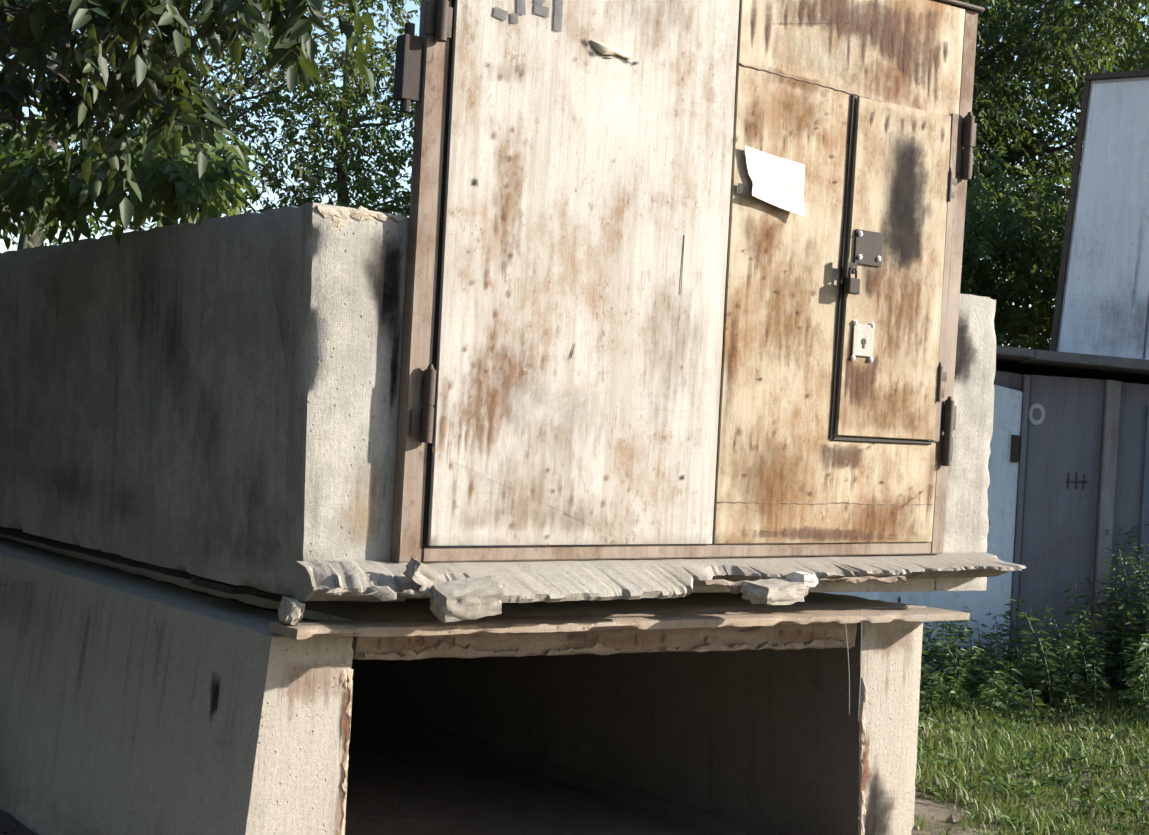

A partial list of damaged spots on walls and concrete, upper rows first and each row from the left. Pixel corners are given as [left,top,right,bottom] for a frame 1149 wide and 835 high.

corrosion [751,0,948,131]
corrosion [736,113,764,151]
corrosion [496,155,522,235]
leakage [895,145,919,267]
corrosion [434,335,525,468]
corrosion [726,304,741,383]
corrosion [767,259,814,362]
corrosion [845,340,917,429]
corrosion [864,265,928,351]
corrosion [824,443,874,487]
corrosion [755,488,915,542]